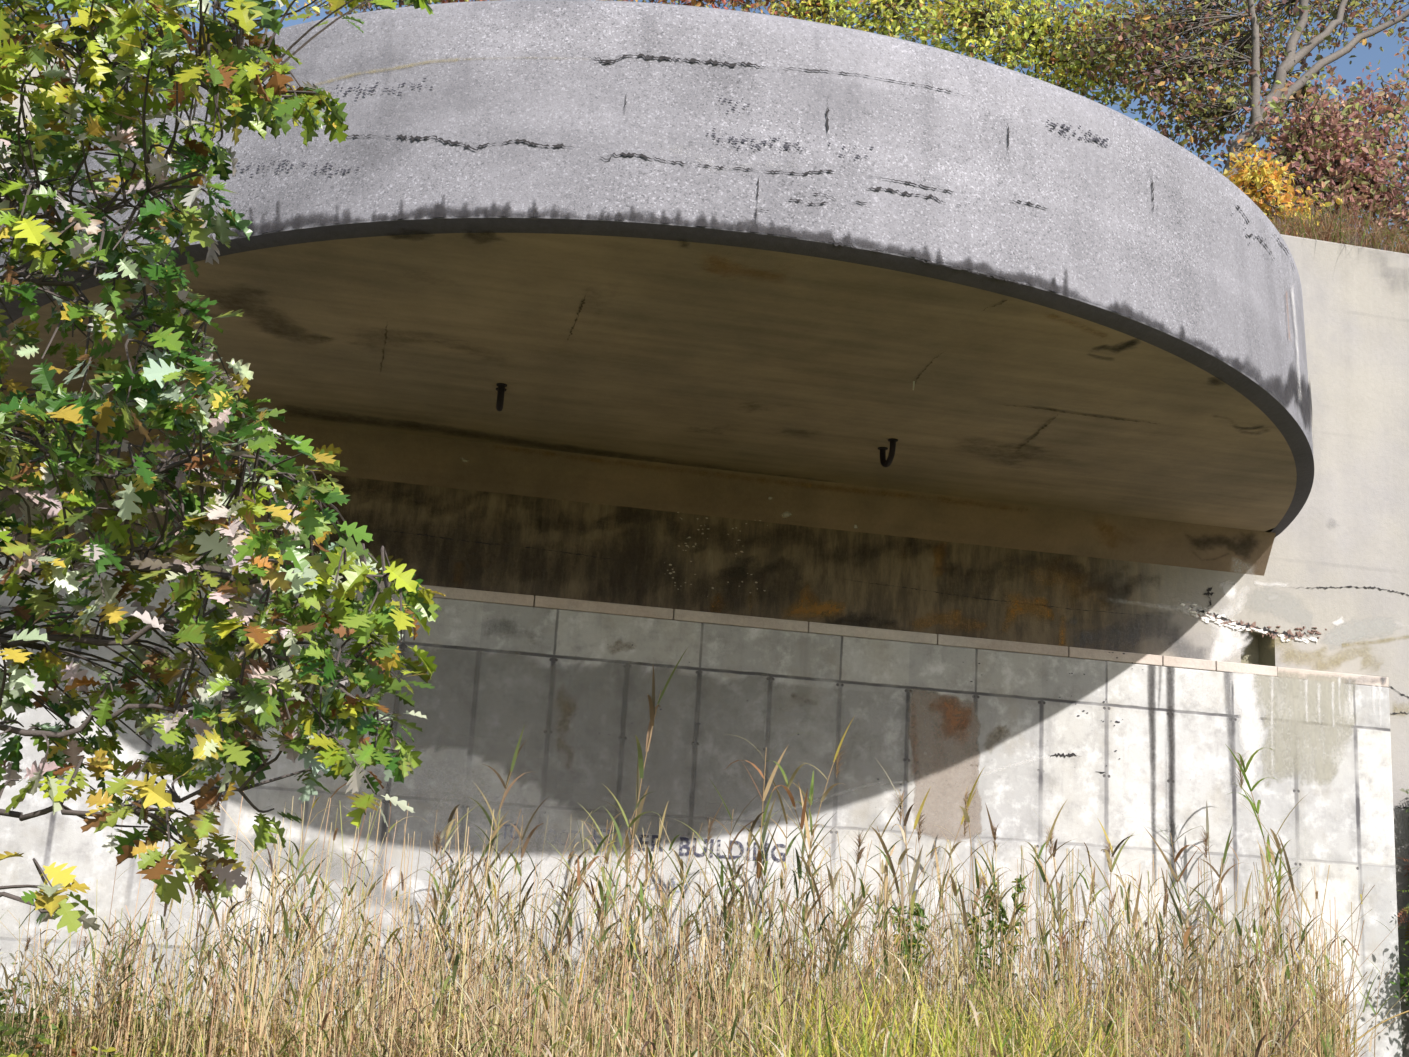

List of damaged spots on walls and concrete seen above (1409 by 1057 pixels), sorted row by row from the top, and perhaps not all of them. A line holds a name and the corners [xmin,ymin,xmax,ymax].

crack [348,54,977,221]
damp [373,204,1312,427]
damp [356,519,373,549]
damp [829,615,888,626]
damp [1184,584,1247,780]
spalling [1181,602,1327,644]
crack [1294,586,1409,596]
rust [909,689,981,841]